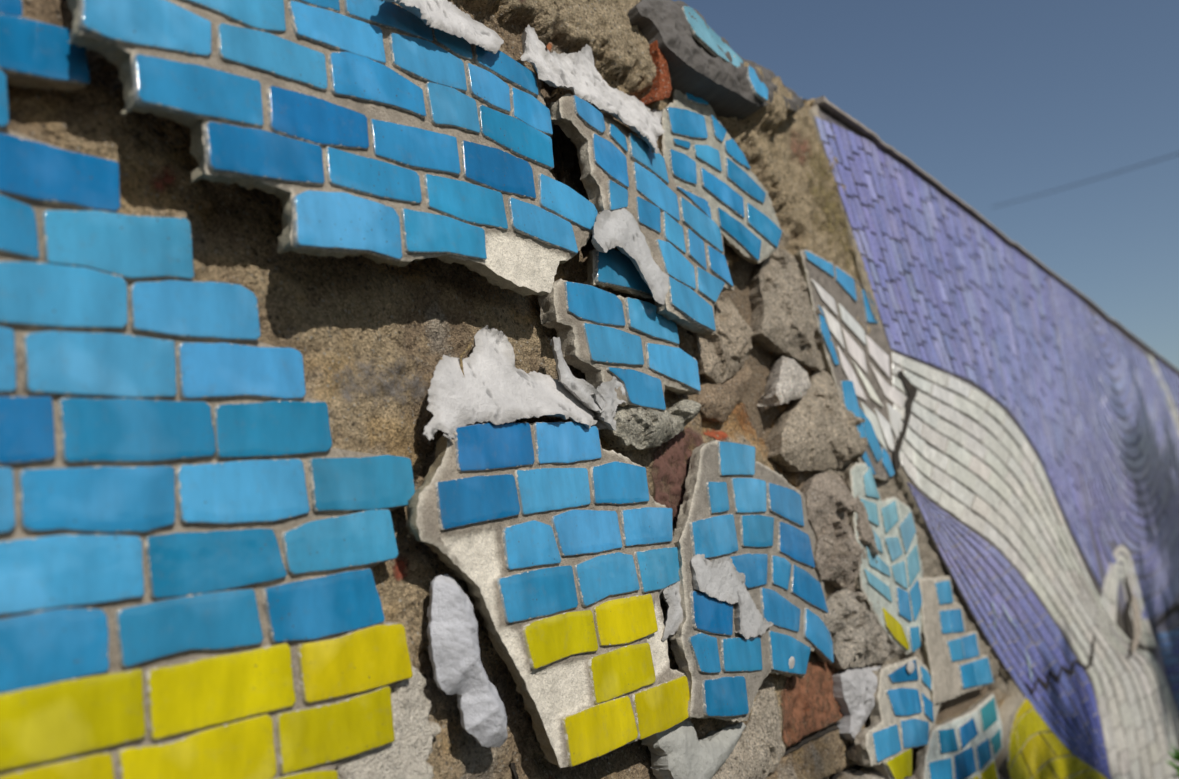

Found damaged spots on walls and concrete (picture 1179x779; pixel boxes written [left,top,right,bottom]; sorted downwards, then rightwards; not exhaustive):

spalling [23,0,74,29]
spalling [448,0,672,127]
spalling [716,56,879,334]
spalling [7,49,586,490]
spalling [554,246,655,305]
spalling [677,325,694,357]
spalling [599,370,849,533]
spalling [335,506,657,779]
spalling [667,636,679,670]
flaking render [690,650,887,779]
crack [829,765,866,779]
spalling [874,477,1011,725]